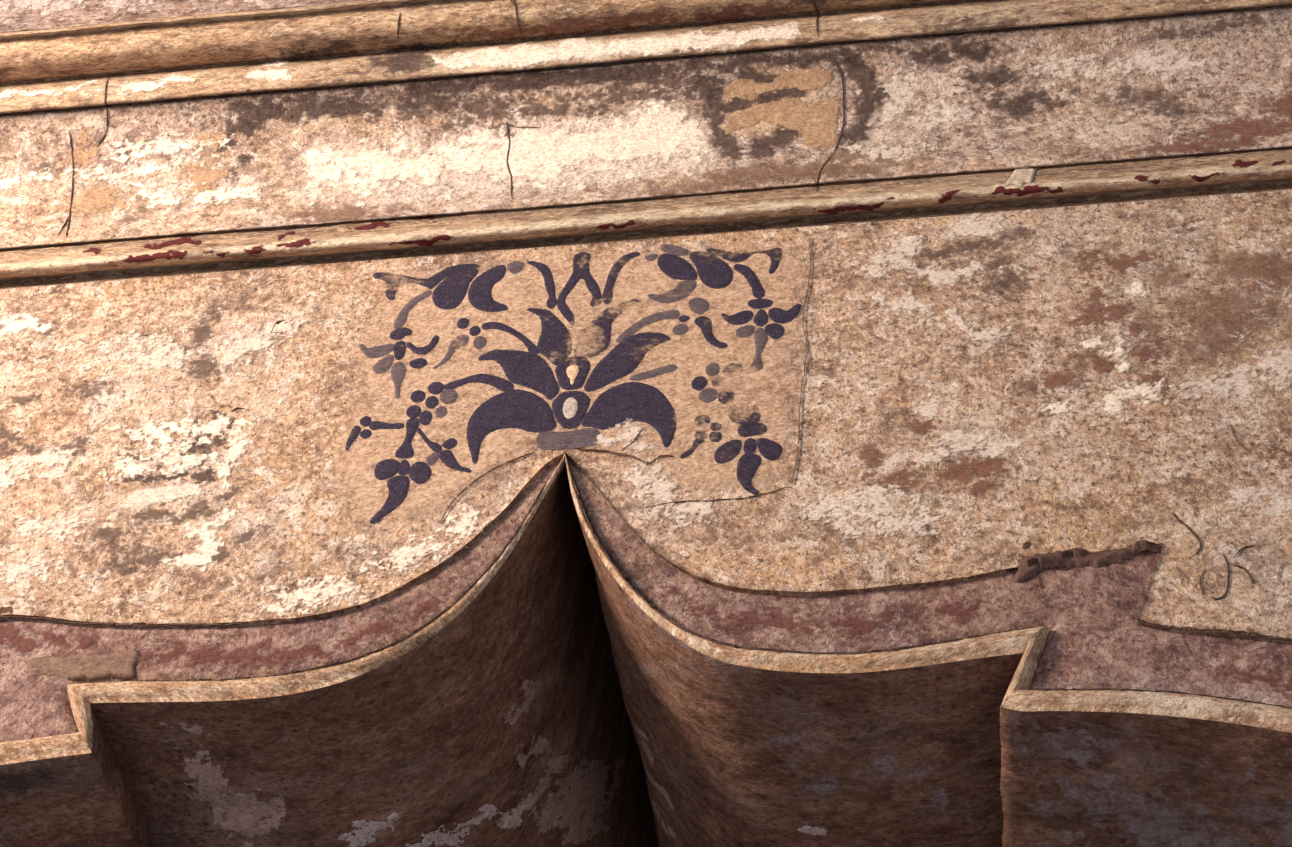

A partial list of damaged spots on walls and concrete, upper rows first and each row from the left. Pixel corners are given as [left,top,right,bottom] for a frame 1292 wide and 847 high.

crack [813,0,850,190]
leakage [652,50,903,196]
crack [58,78,109,235]
peeling [1134,175,1160,185]
peeling [1189,159,1286,182]
peeling [813,197,895,214]
peeling [122,231,315,263]
crack [1229,424,1292,457]
crack [1138,512,1292,655]
crack [1034,688,1292,709]
peeling [159,721,289,847]
peeling [338,811,402,847]